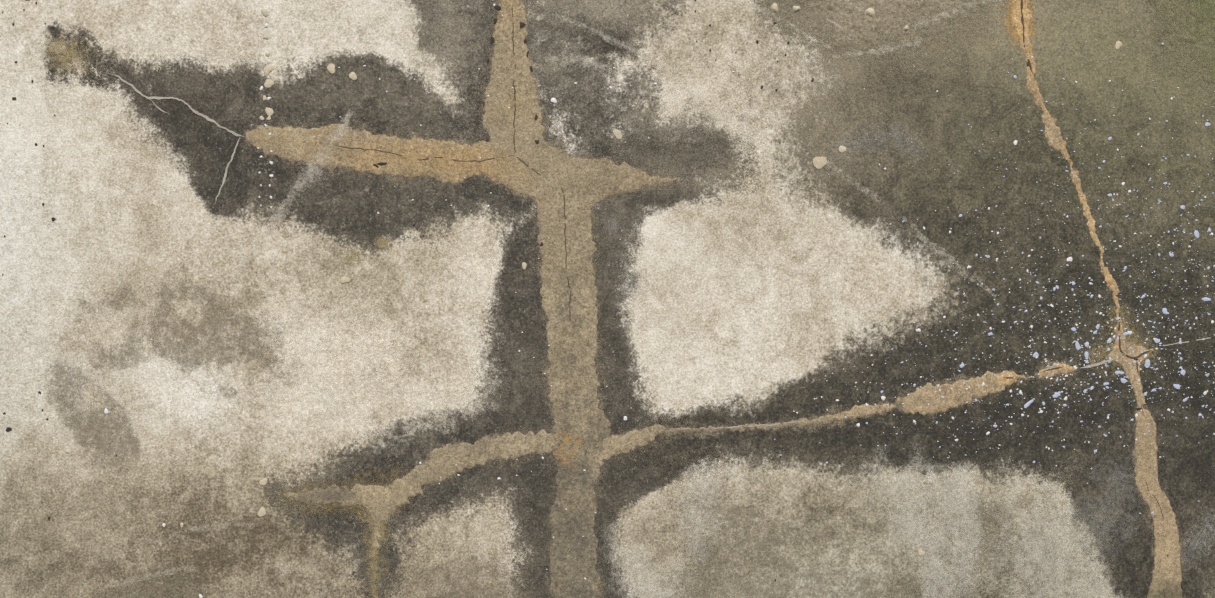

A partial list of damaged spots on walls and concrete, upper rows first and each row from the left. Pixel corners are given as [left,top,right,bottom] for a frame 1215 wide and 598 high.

water stain [44,0,558,598]
crack [112,0,1077,598]
water stain [522,0,1215,598]
crack [1012,0,1186,598]